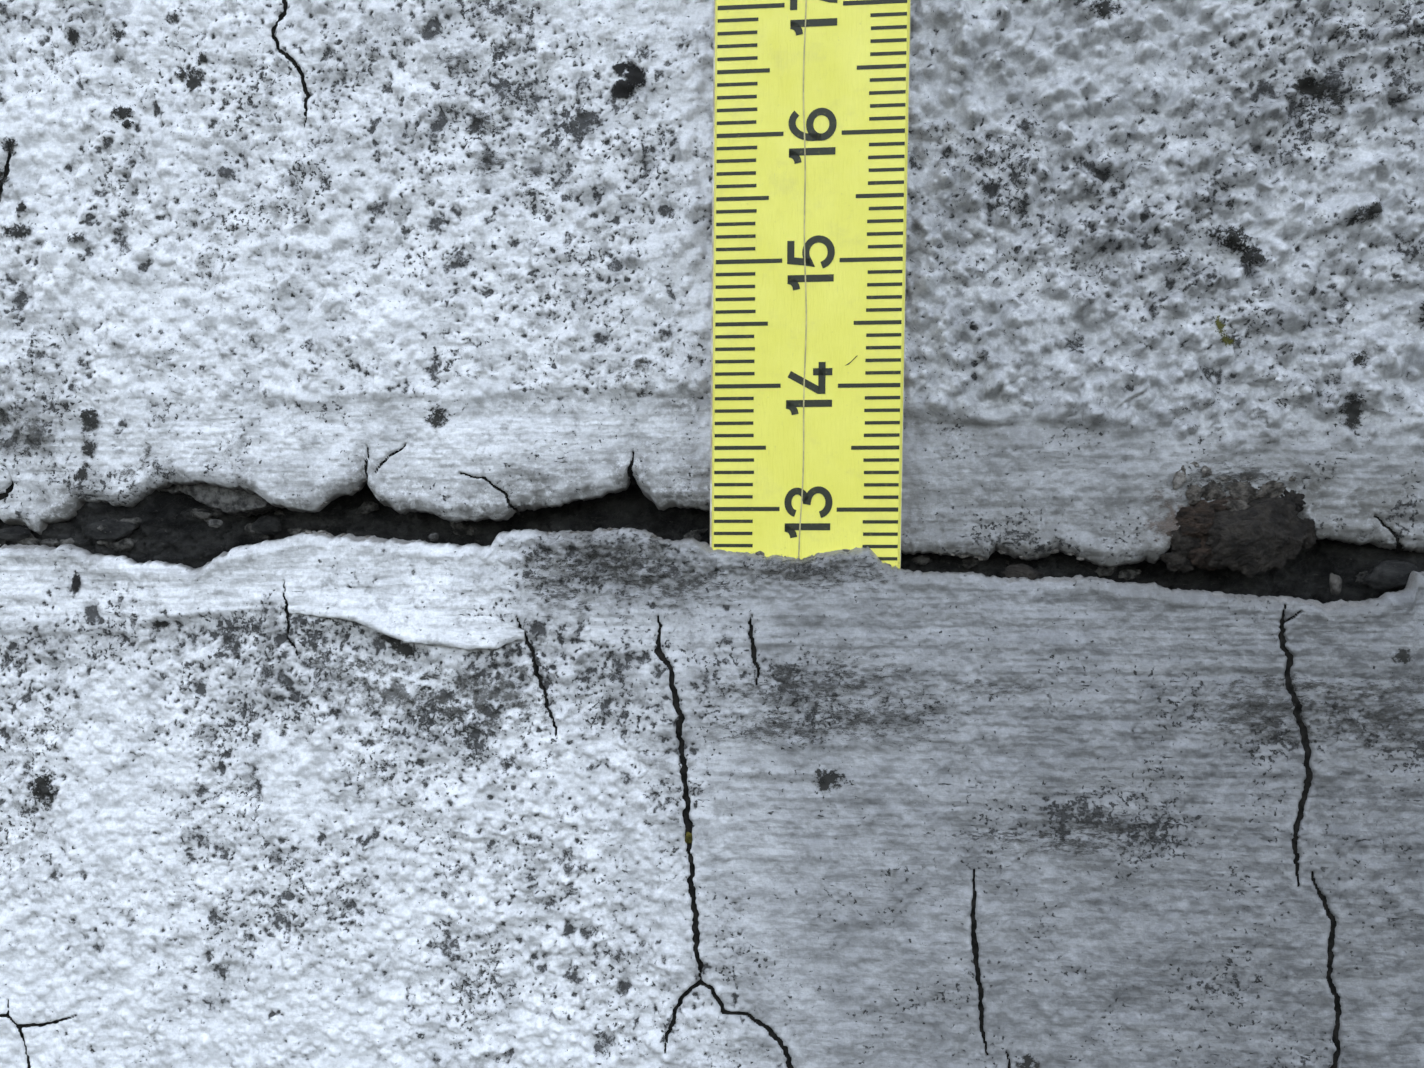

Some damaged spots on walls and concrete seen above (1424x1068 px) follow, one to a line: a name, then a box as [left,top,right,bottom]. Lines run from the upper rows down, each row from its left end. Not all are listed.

crack [271,0,311,128]
crack [0,444,786,569]
rust [1141,460,1317,579]
crack [516,618,557,737]
crack [654,615,794,1068]
crack [886,515,1424,1068]
crack [0,999,77,1068]